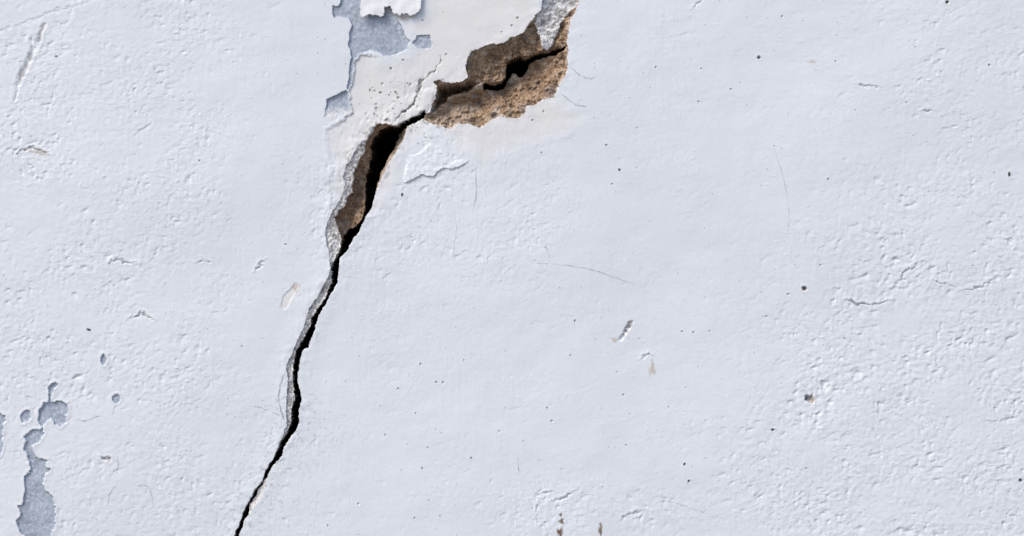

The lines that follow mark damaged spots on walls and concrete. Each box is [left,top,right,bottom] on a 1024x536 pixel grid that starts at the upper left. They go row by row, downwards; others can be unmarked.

peeling [324,0,592,217]
crack [234,55,442,536]
peeling [16,382,69,536]